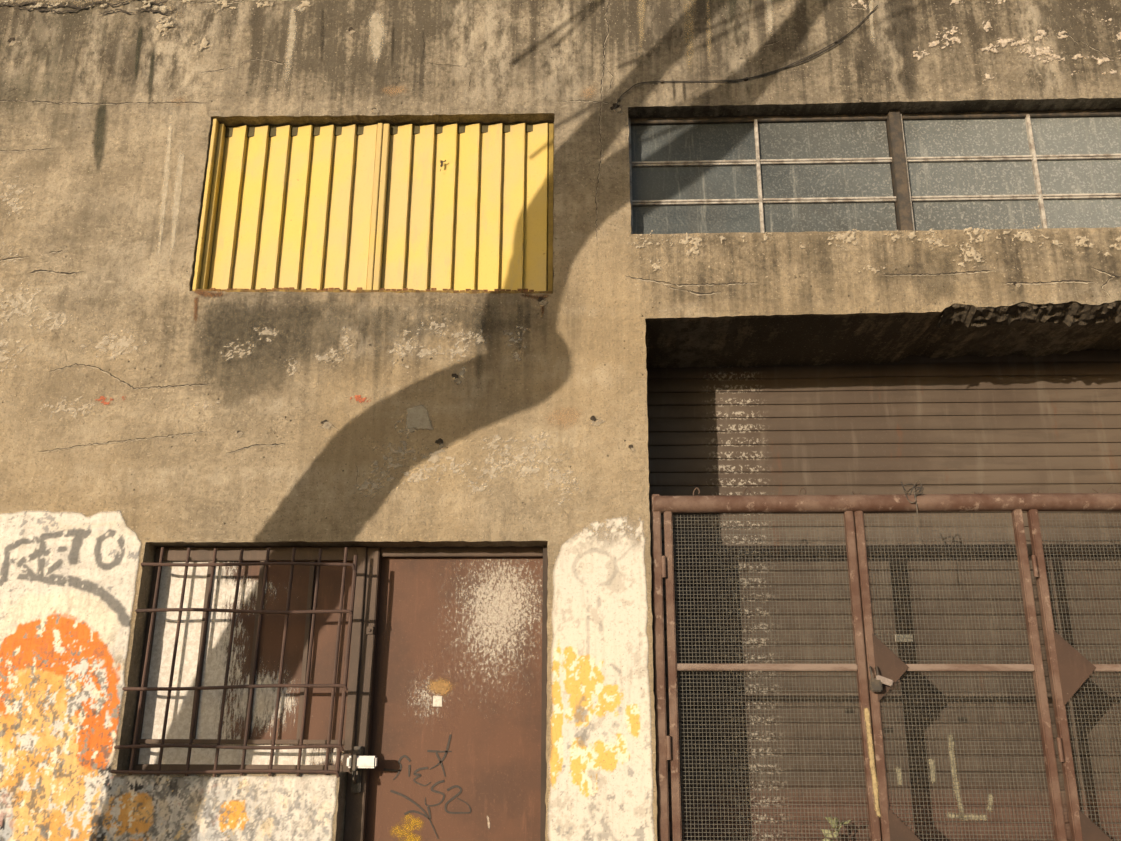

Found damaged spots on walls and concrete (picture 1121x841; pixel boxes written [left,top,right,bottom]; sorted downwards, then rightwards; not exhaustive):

peeling [0,0,191,36]
water stain [135,27,154,88]
water stain [287,5,305,68]
water stain [371,14,394,59]
flaking render [913,26,962,60]
flaking render [981,9,1121,76]
water stain [94,105,106,167]
flaking render [885,225,1121,268]
crack [882,267,1121,297]
crack [49,354,211,390]
crack [42,431,203,453]
peeling [0,545,334,841]